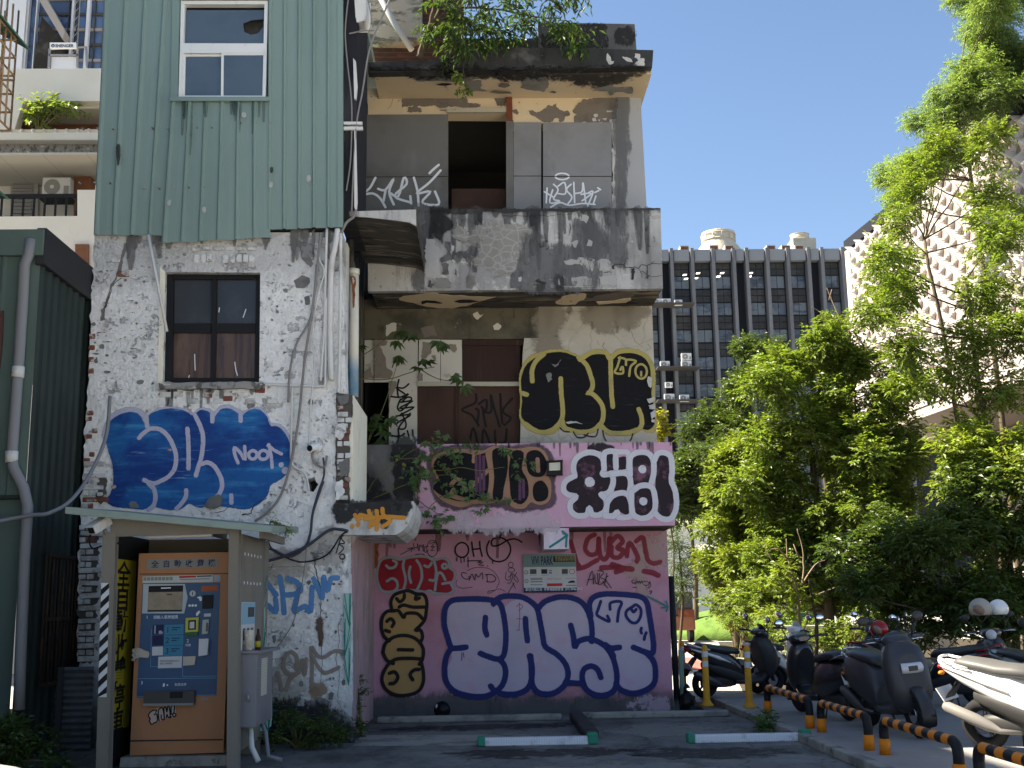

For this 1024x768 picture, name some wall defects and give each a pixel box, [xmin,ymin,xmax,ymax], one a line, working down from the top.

peeling [402,72,633,204]
water stain [369,63,647,295]
water stain [126,235,173,270]
flaking render [192,246,257,263]
water stain [290,229,333,262]
peeling [399,238,495,320]
spalling [555,240,649,305]
crack [601,210,664,277]
flaking render [88,322,110,382]
flaking render [84,411,98,439]
flaking render [160,388,277,409]
flaking render [77,525,103,662]